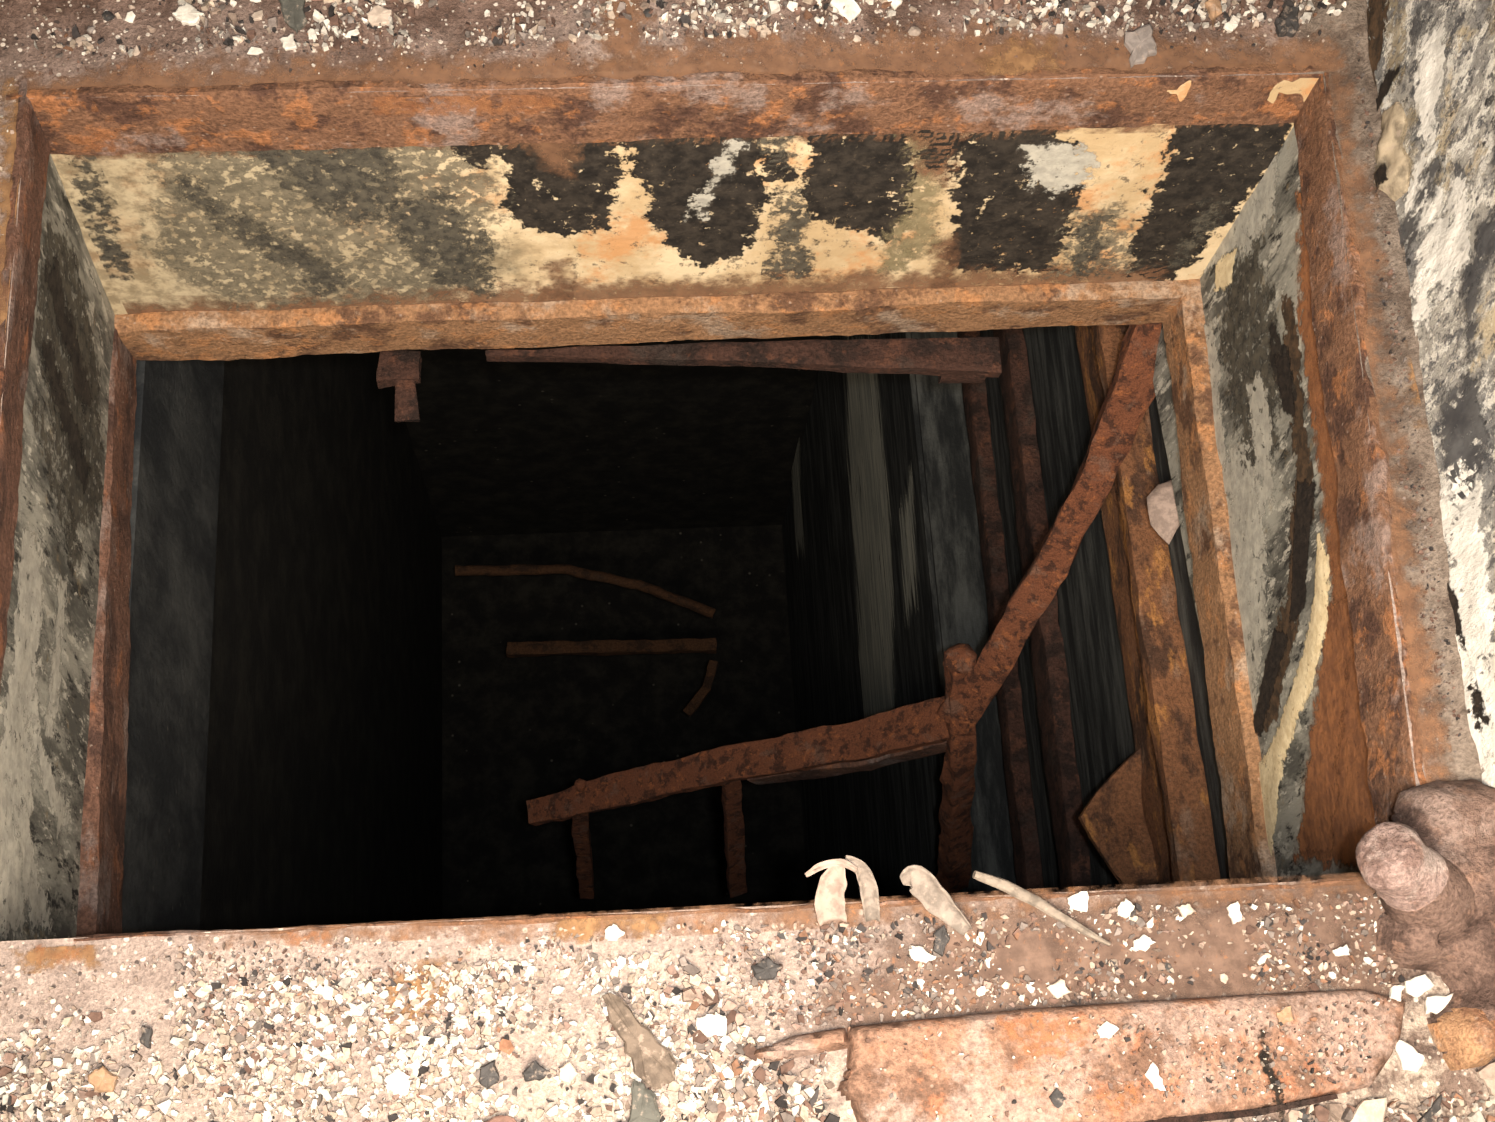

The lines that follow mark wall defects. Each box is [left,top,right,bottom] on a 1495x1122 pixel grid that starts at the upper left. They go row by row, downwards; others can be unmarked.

damp [81,193,130,272]
damp [161,175,352,297]
damp [249,147,496,303]
rust [0,0,1341,344]
damp [877,139,944,273]
damp [1071,215,1115,277]
damp [1269,320,1297,401]
damp [32,257,93,573]
rust [246,920,443,943]
rust [555,905,741,945]
rust [765,905,860,930]